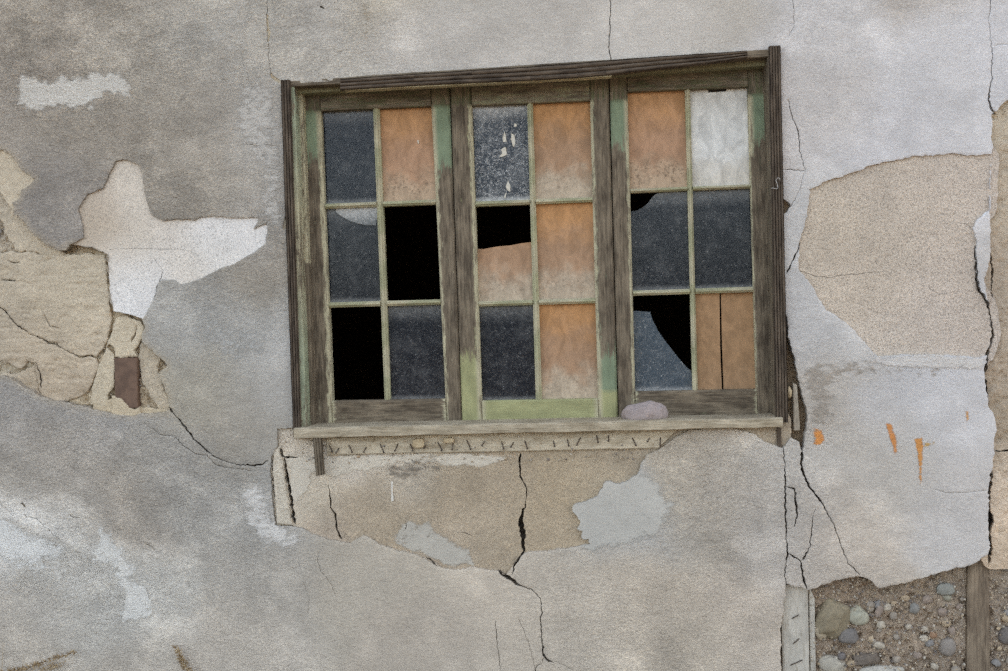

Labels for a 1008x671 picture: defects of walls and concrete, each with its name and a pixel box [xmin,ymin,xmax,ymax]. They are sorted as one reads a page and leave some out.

flaking render [0,150,268,416]
flaking render [790,101,1008,671]
flaking render [271,428,699,579]
crack [499,453,570,671]
crack [782,446,859,588]